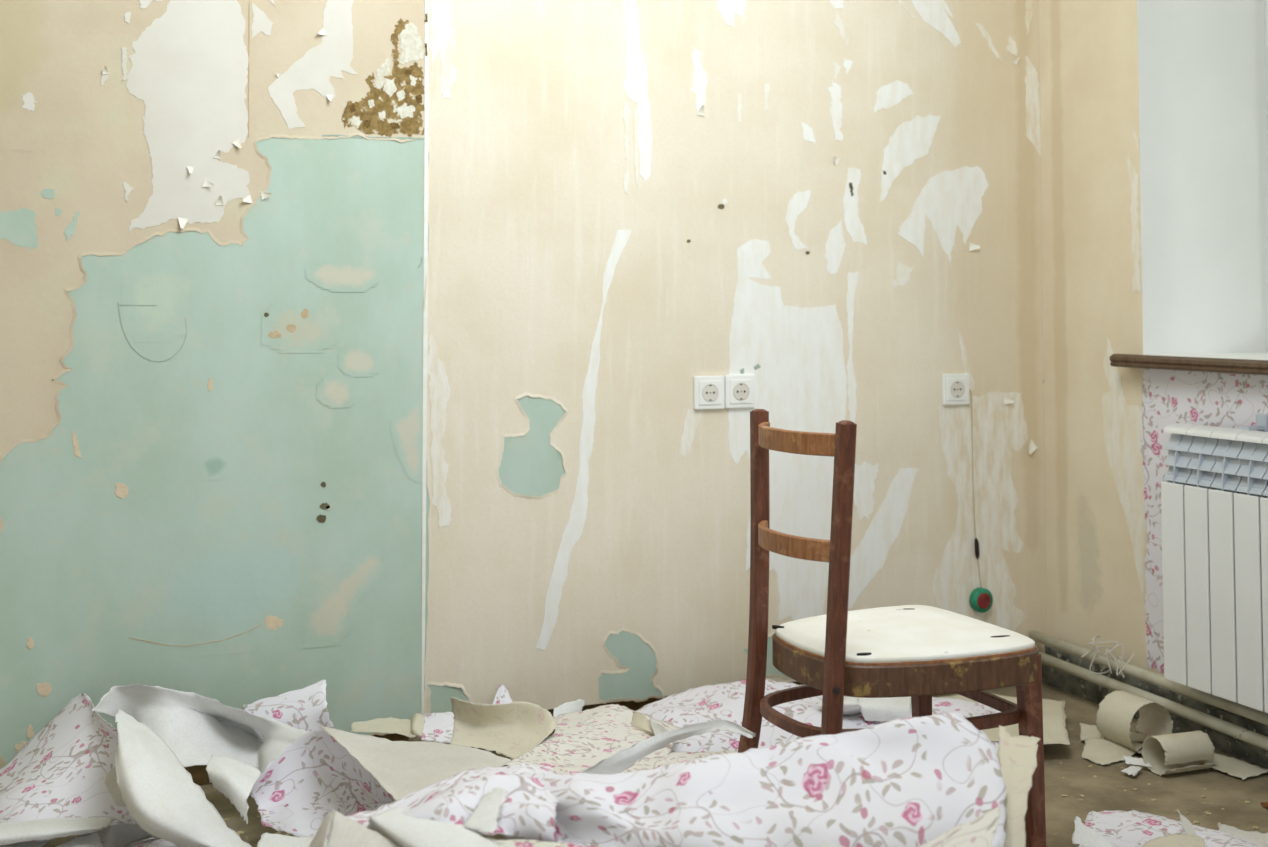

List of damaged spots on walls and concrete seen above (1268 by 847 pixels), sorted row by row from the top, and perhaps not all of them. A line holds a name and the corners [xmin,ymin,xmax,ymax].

peeling [0,13,474,768]
peeling [495,392,569,500]
peeling [595,627,665,704]
peeling [766,631,791,680]